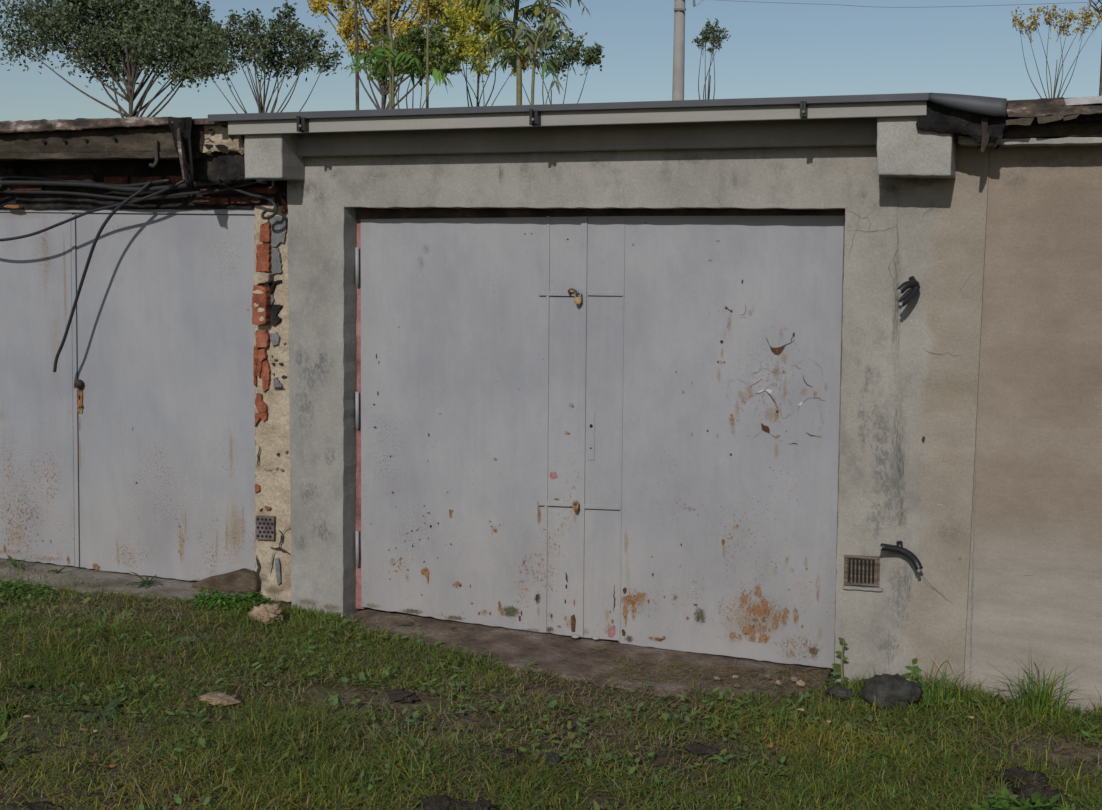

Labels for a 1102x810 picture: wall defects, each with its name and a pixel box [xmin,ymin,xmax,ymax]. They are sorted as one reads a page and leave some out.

flaking render [247,196,288,427]
peeling [766,326,795,355]
peeling [728,360,826,438]
corrosion [388,505,453,596]
corrosion [622,588,649,642]
corrosion [726,586,818,657]